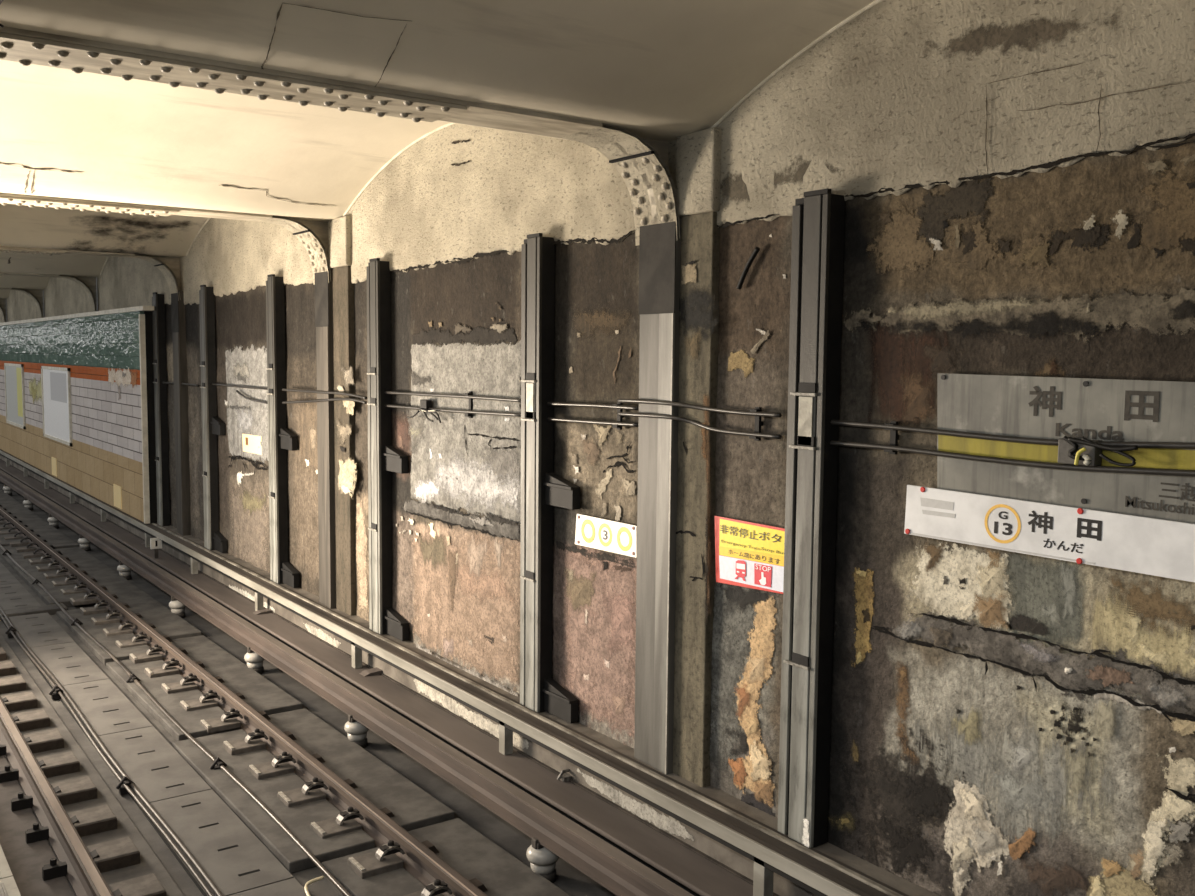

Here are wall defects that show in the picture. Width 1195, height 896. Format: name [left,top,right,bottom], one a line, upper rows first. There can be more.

leakage [924,18,1078,58]
crack [0,163,76,194]
leakage [720,174,750,201]
leakage [774,156,836,187]
peeling [1112,154,1195,257]
peeling [681,261,697,285]
peeling [336,367,369,614]
peeling [907,542,1015,633]
peeling [728,595,777,807]
crack [871,613,1195,724]
peeling [943,779,1036,896]
peeling [1086,690,1195,896]